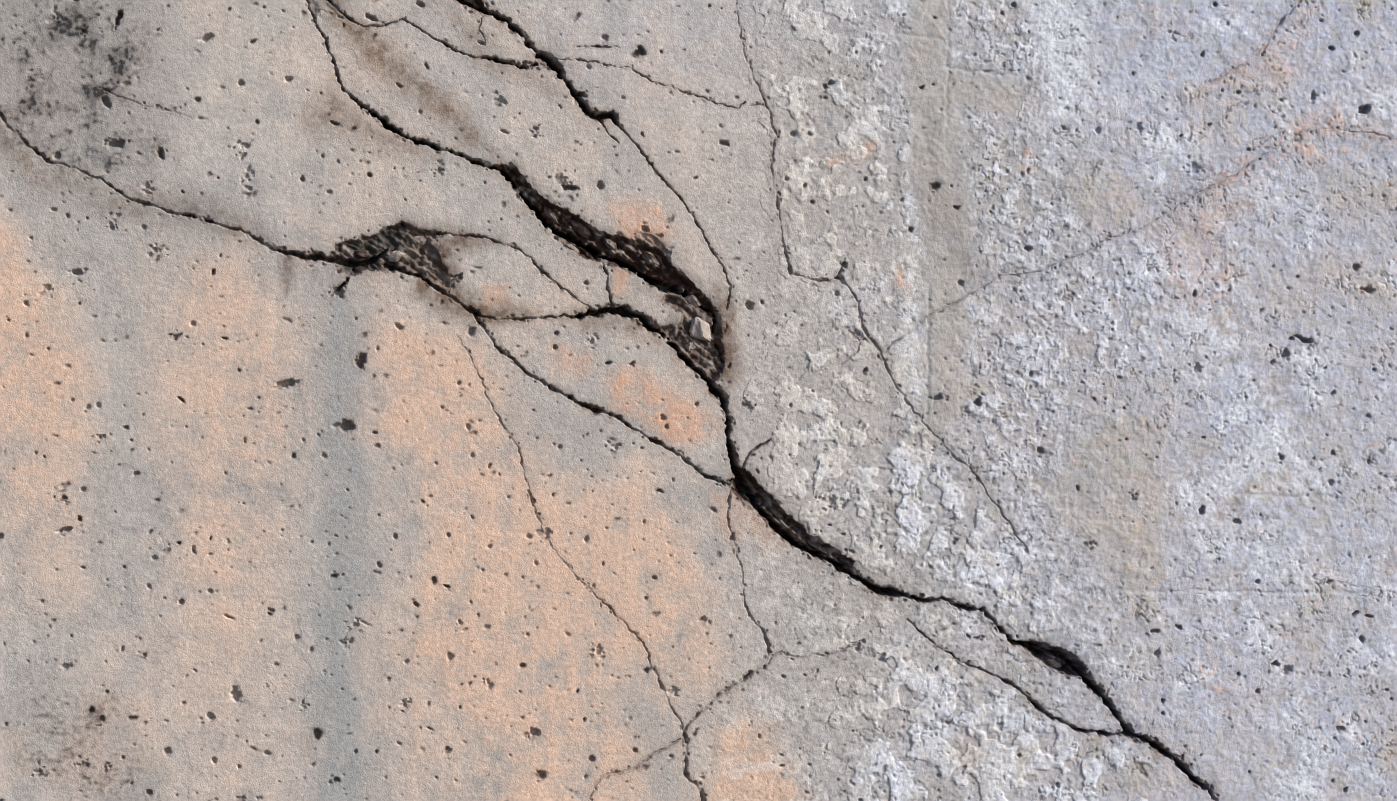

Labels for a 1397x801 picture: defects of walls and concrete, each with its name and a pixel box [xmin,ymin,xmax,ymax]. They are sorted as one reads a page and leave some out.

crack [99,86,193,120]
crack [0,105,388,297]
crack [306,0,1397,801]